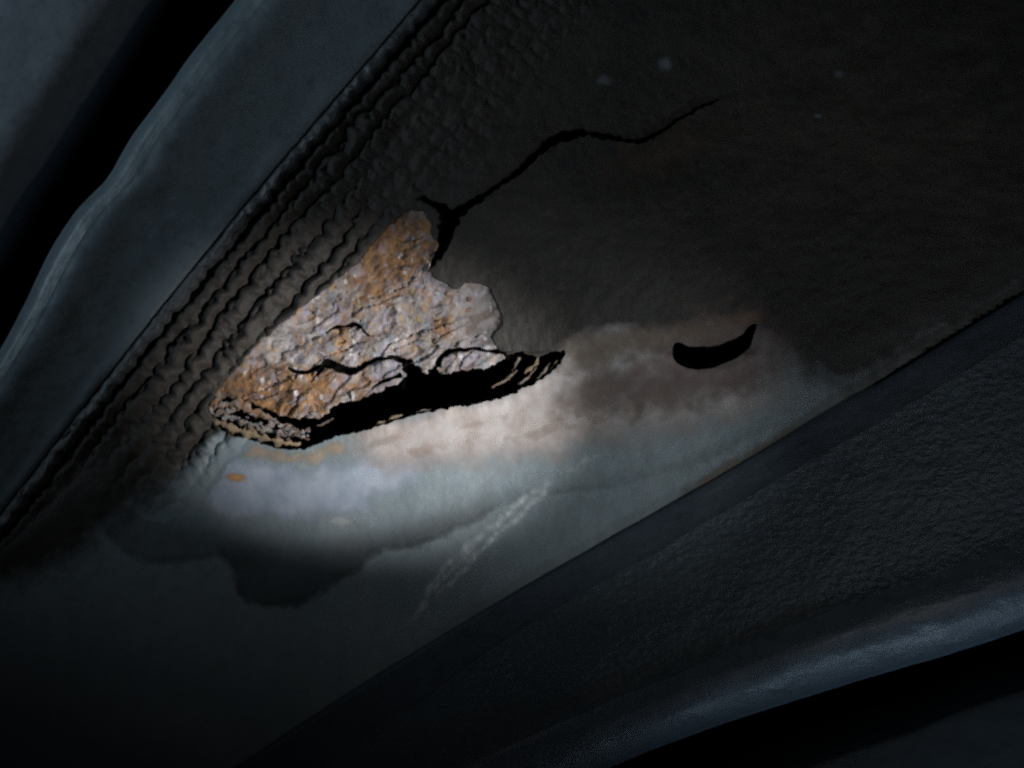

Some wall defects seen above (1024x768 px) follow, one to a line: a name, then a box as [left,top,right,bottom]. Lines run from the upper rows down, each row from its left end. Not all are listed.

peeling [0,0,620,552]
rust [208,210,505,419]
crack [418,99,718,270]
efflorescence [208,459,416,525]